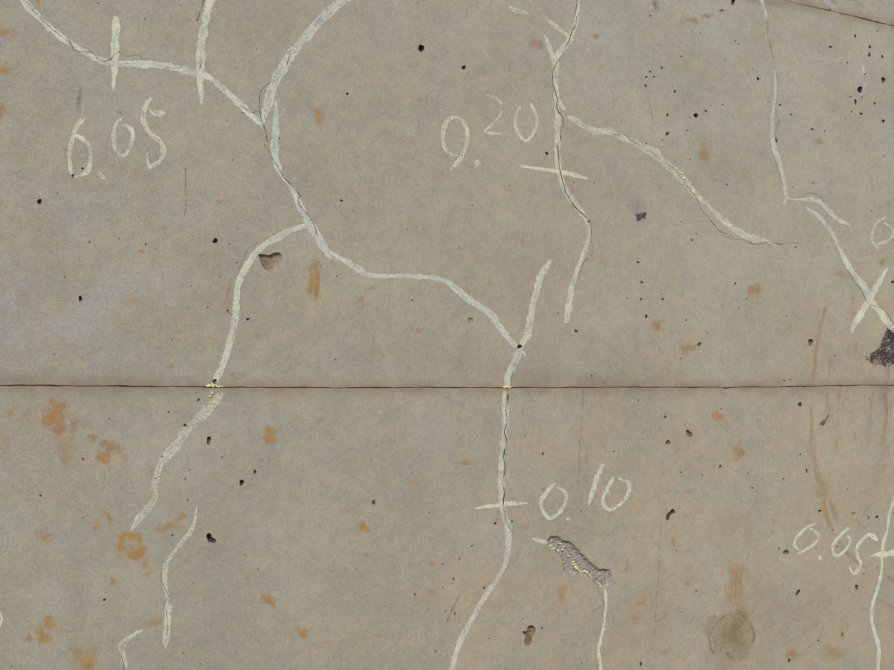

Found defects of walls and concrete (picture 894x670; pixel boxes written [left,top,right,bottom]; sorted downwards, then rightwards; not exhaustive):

crack [242,82,318,237]
crack [552,0,593,274]
rust [0,396,128,470]
crack [502,362,519,560]
rust [114,531,153,577]